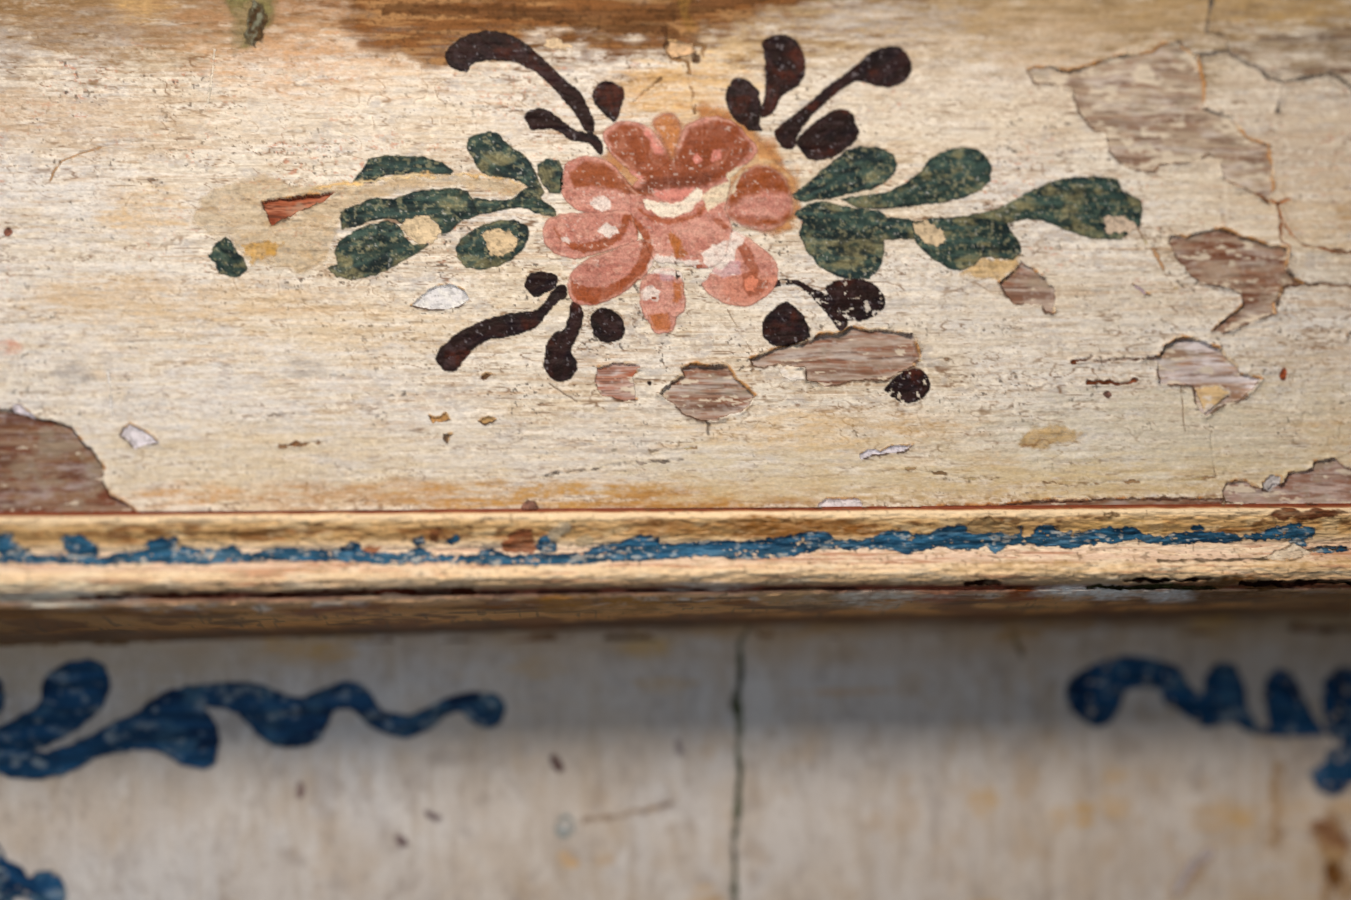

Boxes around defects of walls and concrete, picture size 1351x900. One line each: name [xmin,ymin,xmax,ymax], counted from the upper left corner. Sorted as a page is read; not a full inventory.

crack [1177,0,1351,114]
peeling [1026,42,1275,204]
peeling [660,361,756,422]
peeling [749,326,921,387]
peeling [998,261,1056,315]
crack [1070,355,1144,386]
crack [1138,229,1177,289]
peeling [1147,227,1304,415]
crack [1233,183,1351,312]
peeling [0,404,139,512]
peeling [965,458,1351,536]
crack [731,640,744,900]